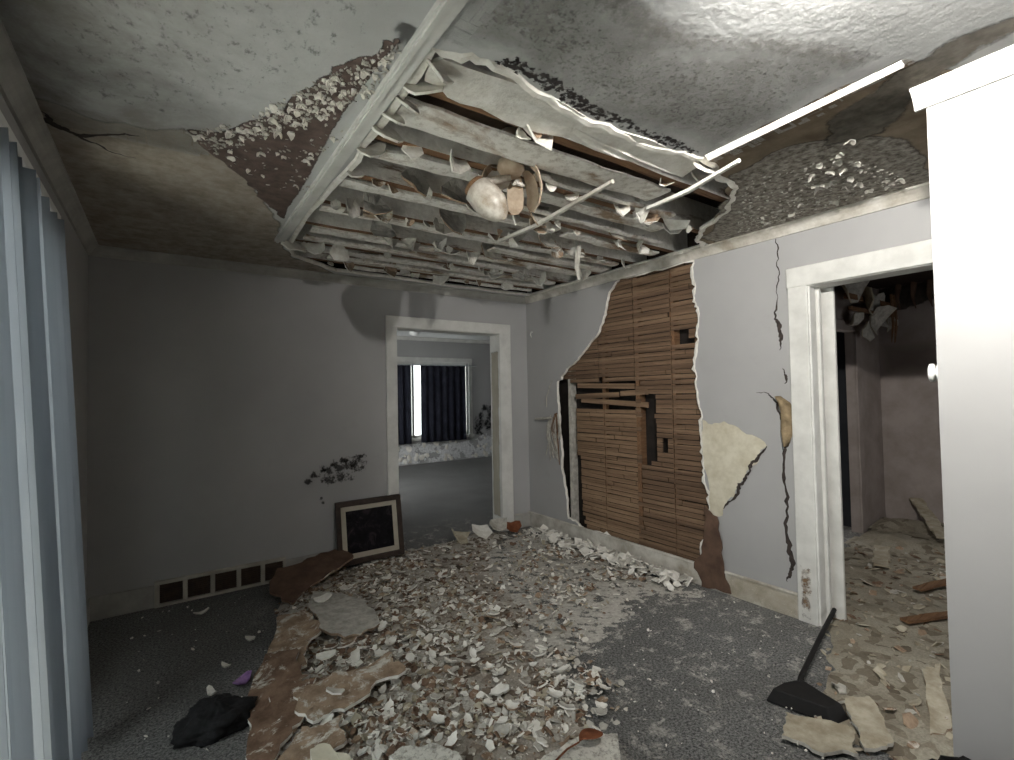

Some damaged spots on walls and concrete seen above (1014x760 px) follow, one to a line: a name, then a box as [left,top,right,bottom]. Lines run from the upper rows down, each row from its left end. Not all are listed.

crack [41,111,135,158]
damp [35,98,332,273]
peeling [186,39,402,218]
peeling [356,59,454,160]
peeling [516,124,553,150]
mould [495,57,699,154]
peeling [613,203,630,217]
peeling [691,161,714,183]
peeling [701,136,929,243]
crack [757,239,788,420]
flaking render [557,224,767,594]
crack [782,447,796,581]